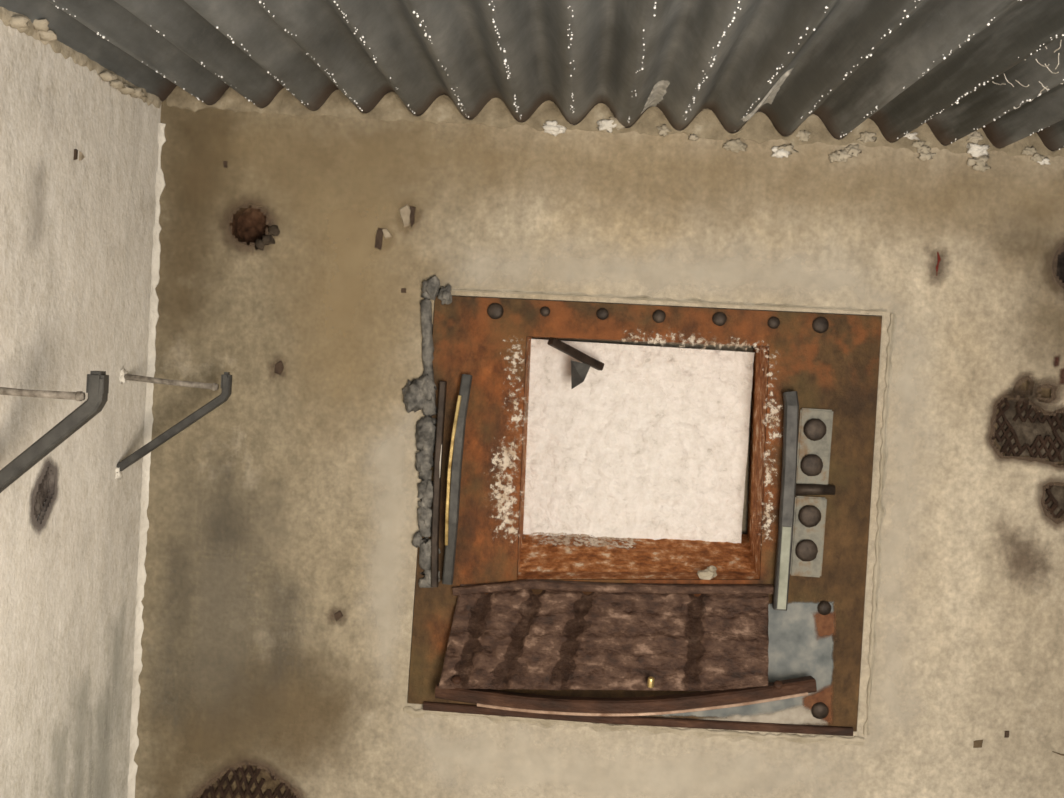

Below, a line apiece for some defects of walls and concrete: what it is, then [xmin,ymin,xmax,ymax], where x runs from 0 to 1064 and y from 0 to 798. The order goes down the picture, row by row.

spalling [987,373,1064,527]
rust [814,613,835,637]
rust [803,685,833,723]
spalling [188,757,304,798]